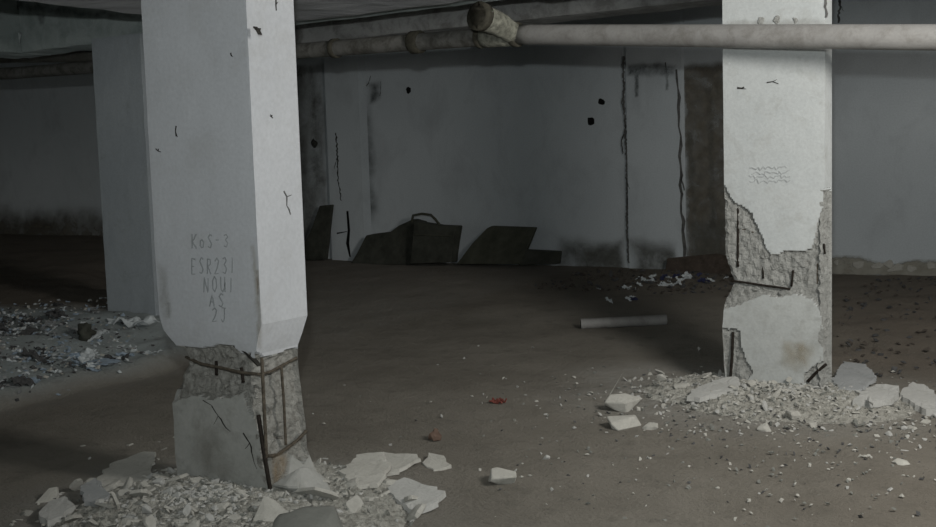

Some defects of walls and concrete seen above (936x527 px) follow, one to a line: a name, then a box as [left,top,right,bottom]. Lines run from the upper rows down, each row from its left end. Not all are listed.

crack [824,0,843,23]
crack [621,56,630,263]
spalling [723,187,936,388]
spalling [173,344,309,490]